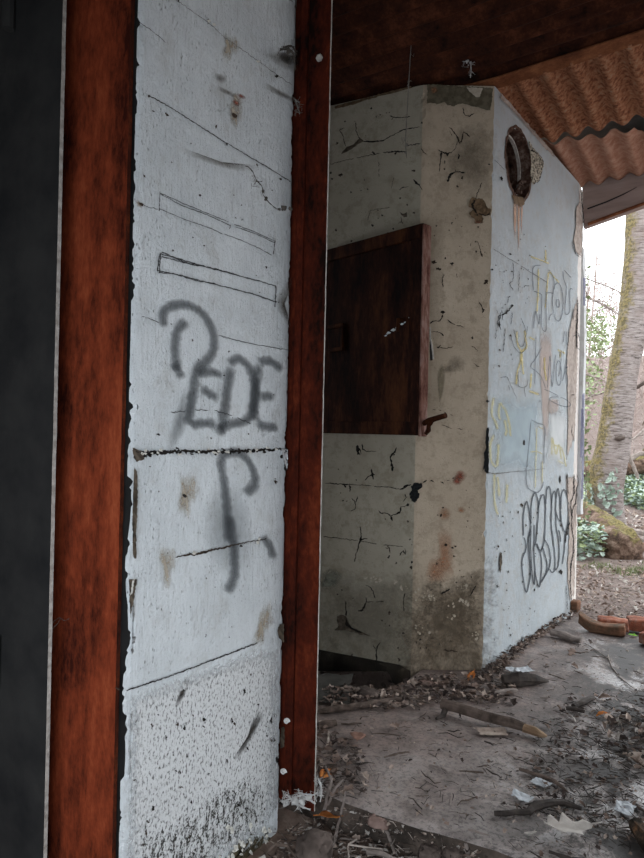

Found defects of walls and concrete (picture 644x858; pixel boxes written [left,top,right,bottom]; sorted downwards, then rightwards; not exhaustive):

crack [150,96,291,182]
crack [330,109,474,223]
spalling [469,183,491,228]
rust [512,195,525,243]
crack [134,446,289,459]
crack [324,445,406,562]
crack [175,537,267,558]
leakage [406,576,485,671]
crack [126,642,257,691]